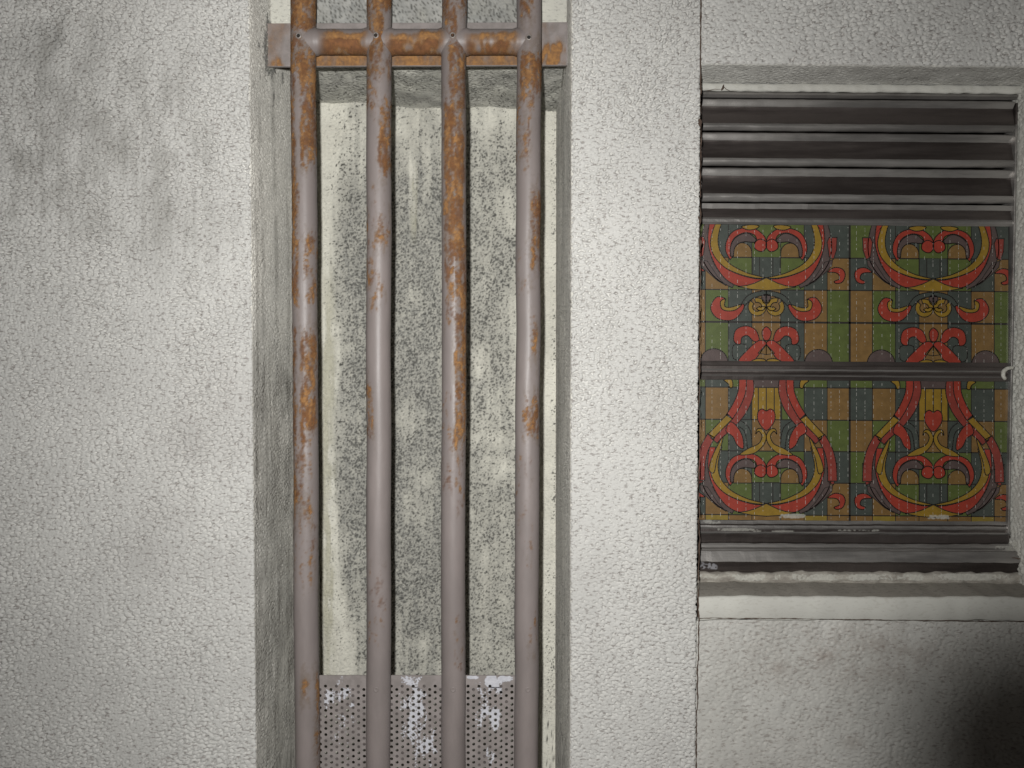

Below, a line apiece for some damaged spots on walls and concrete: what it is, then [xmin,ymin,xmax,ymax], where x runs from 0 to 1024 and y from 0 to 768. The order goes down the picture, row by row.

rust [292,328,317,514]
water stain [320,151,367,673]
water stain [391,135,442,686]
rust [272,0,563,461]
water stain [465,123,516,693]